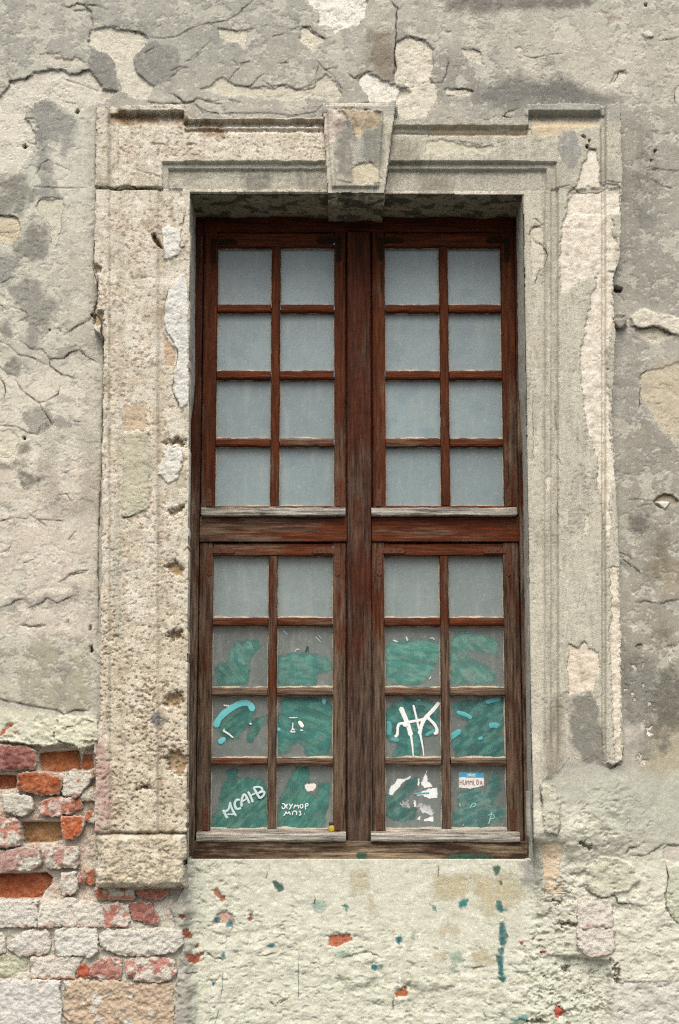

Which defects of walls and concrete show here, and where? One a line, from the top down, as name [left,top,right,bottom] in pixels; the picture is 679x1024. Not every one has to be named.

flaking render [0,24,153,182]
crack [71,2,95,35]
crack [144,0,361,117]
flaking render [295,0,368,49]
flaking render [201,35,472,148]
flaking render [340,161,381,185]
flaking render [162,225,182,259]
flaking render [164,275,189,407]
spalling [559,146,679,553]
crack [0,218,148,646]
spalling [567,566,655,761]
flaking render [0,713,204,1024]